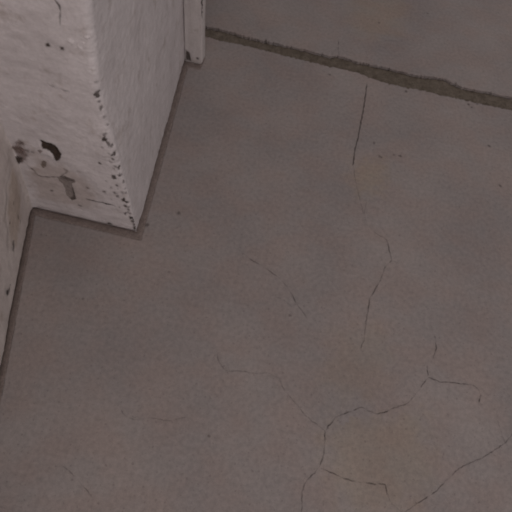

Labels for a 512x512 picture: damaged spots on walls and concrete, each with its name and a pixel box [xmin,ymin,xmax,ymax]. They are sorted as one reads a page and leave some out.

crack [353,86,367,164]
peeling [12,143,27,163]
flaking render [38,140,61,161]
peeling [58,176,76,200]